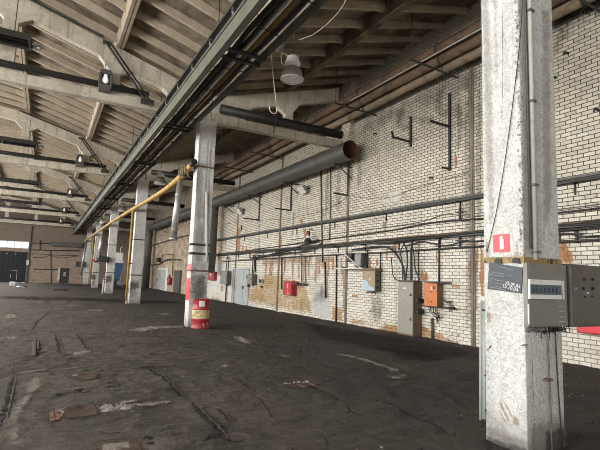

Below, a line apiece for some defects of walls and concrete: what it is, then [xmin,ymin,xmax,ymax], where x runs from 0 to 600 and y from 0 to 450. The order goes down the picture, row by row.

peeling [249,275,311,313]
crack [136,359,244,442]